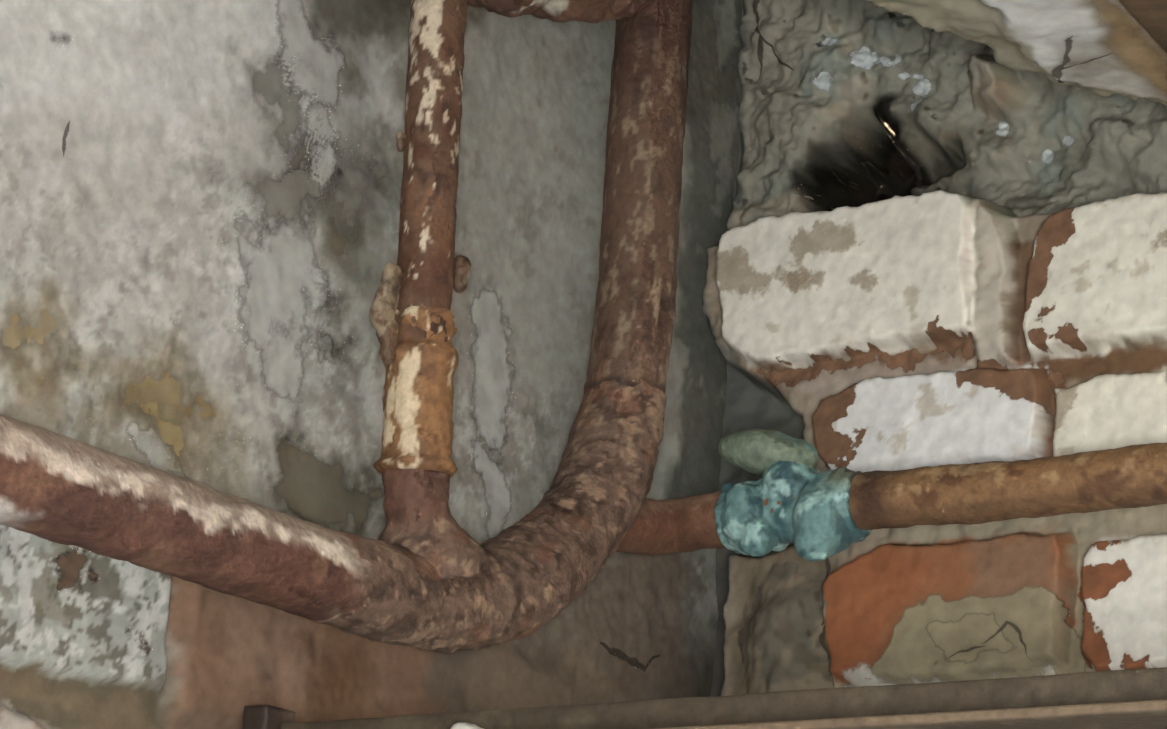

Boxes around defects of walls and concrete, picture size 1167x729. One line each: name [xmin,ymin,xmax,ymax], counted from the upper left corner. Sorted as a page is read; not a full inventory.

crack [752,0,793,83]
damp [850,46,931,111]
crack [1052,36,1112,83]
spalling [799,103,929,212]
damp [234,58,388,402]
peeling [757,207,1087,415]
damp [116,345,225,478]
peeling [812,383,866,469]
damp [268,430,385,536]
peeling [53,548,98,590]
crack [946,621,1031,660]
peeling [1077,540,1155,671]